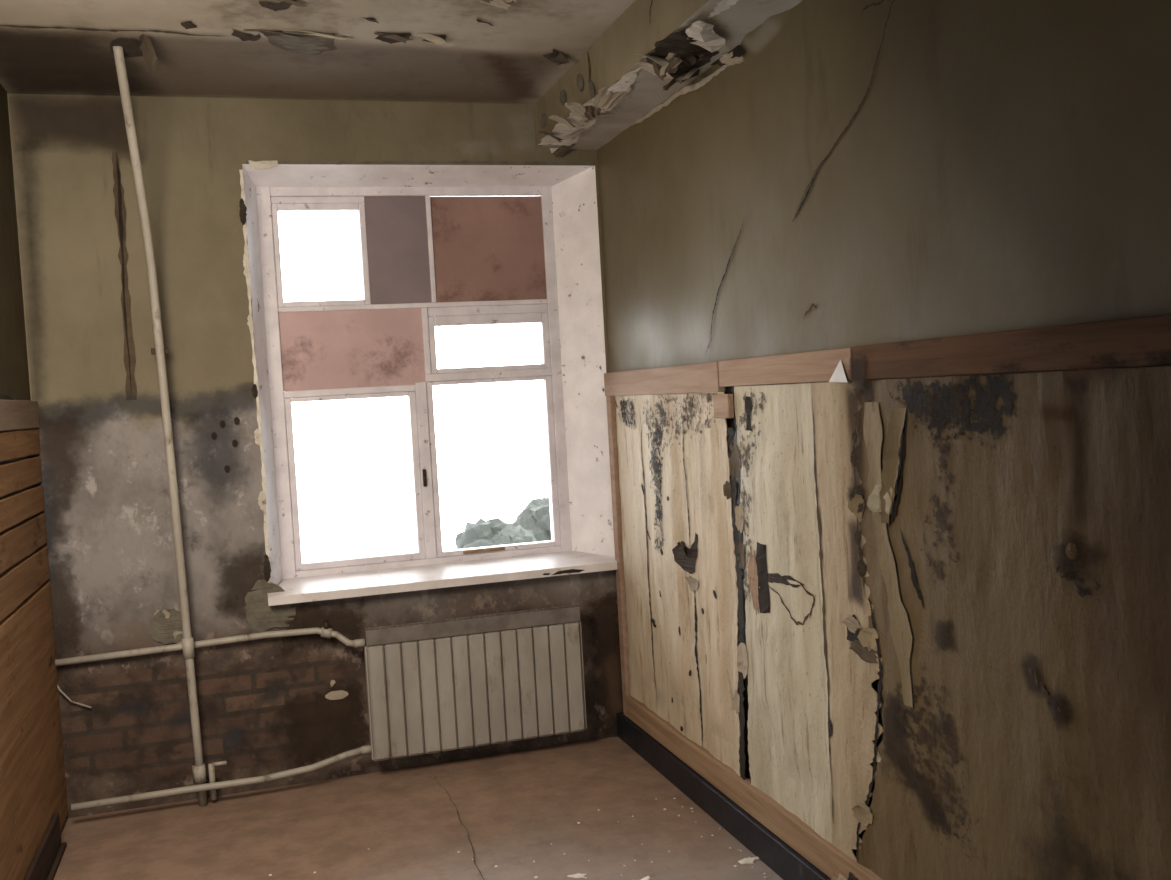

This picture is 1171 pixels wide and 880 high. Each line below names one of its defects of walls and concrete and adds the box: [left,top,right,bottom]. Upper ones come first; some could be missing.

crack [792,0,895,222]
leakage [39,414,79,548]
leakage [211,417,240,440]
spalling [66,0,745,778]
leakage [615,393,717,553]
leakage [847,389,864,506]
leakage [890,374,1025,584]
leakage [47,563,78,680]
leakage [723,389,765,779]
leakage [849,523,862,603]
leakage [878,662,975,857]